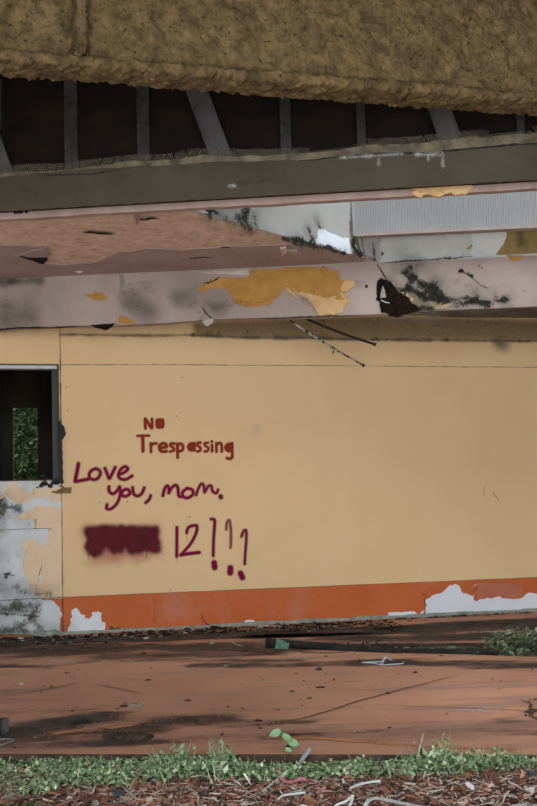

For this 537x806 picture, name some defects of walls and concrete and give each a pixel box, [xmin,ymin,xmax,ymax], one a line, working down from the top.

peeling [0,229,367,316]
water stain [196,265,537,346]
spalling [376,264,455,318]
water stain [0,499,21,516]
peeling [0,483,105,632]
peeling [388,583,537,616]
water stain [0,600,537,669]
crack [278,673,463,724]
crack [455,698,537,719]